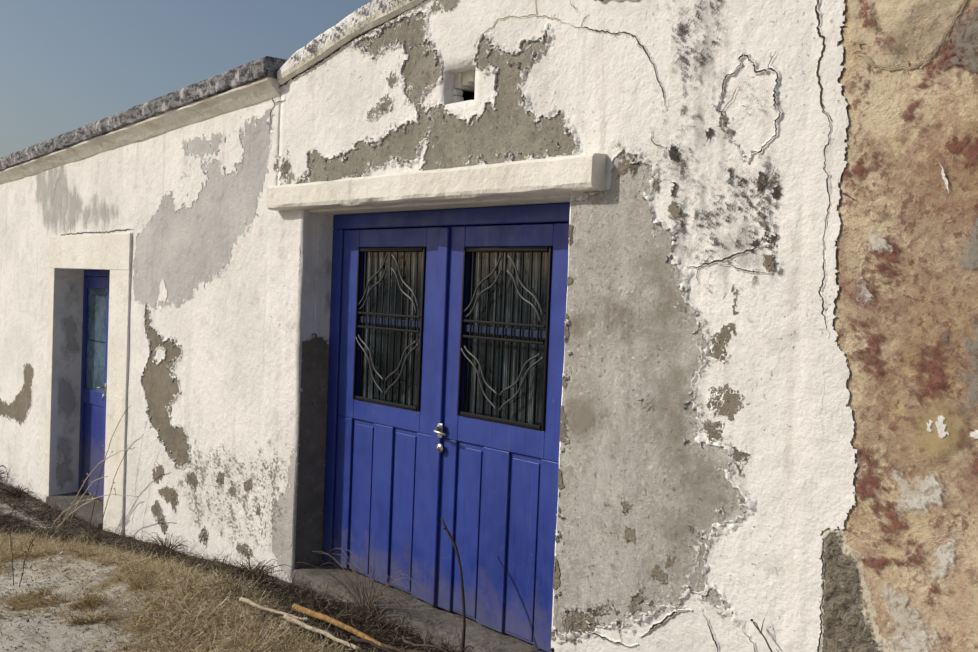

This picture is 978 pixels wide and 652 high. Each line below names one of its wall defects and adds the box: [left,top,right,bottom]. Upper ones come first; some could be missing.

crack [266,0,430,136]
peeling [273,0,587,185]
crack [473,0,668,111]
water stain [673,0,722,127]
crack [716,52,785,165]
water stain [656,139,781,264]
crack [814,0,864,441]
peeling [0,359,36,426]
peeling [140,279,198,535]
peeling [551,143,758,645]
spalling [817,449,952,652]
crack [557,608,721,652]